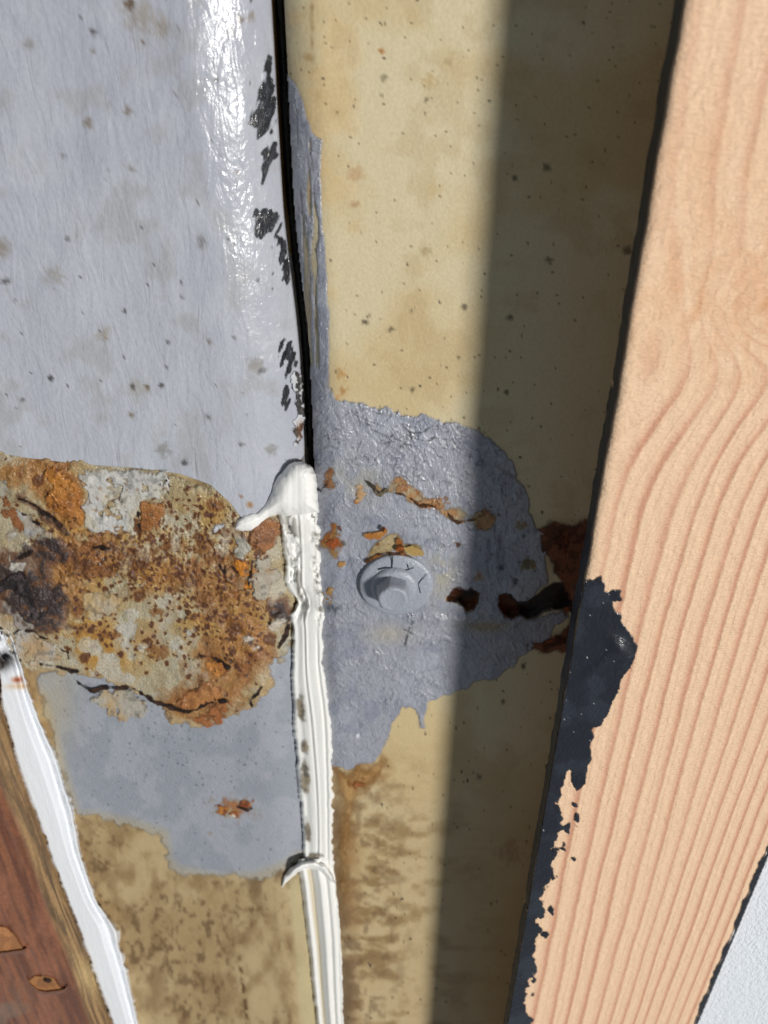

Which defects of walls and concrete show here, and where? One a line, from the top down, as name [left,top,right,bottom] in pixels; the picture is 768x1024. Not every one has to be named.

peeling [291,371,305,447]
corrosion [317,468,335,492]
corrosion [354,484,366,504]
peeling [366,477,496,531]
corrosion [320,523,346,567]
peeling [364,527,424,564]
corrosion [0,451,296,729]
corrosion [531,519,587,653]
corrosion [217,799,254,818]